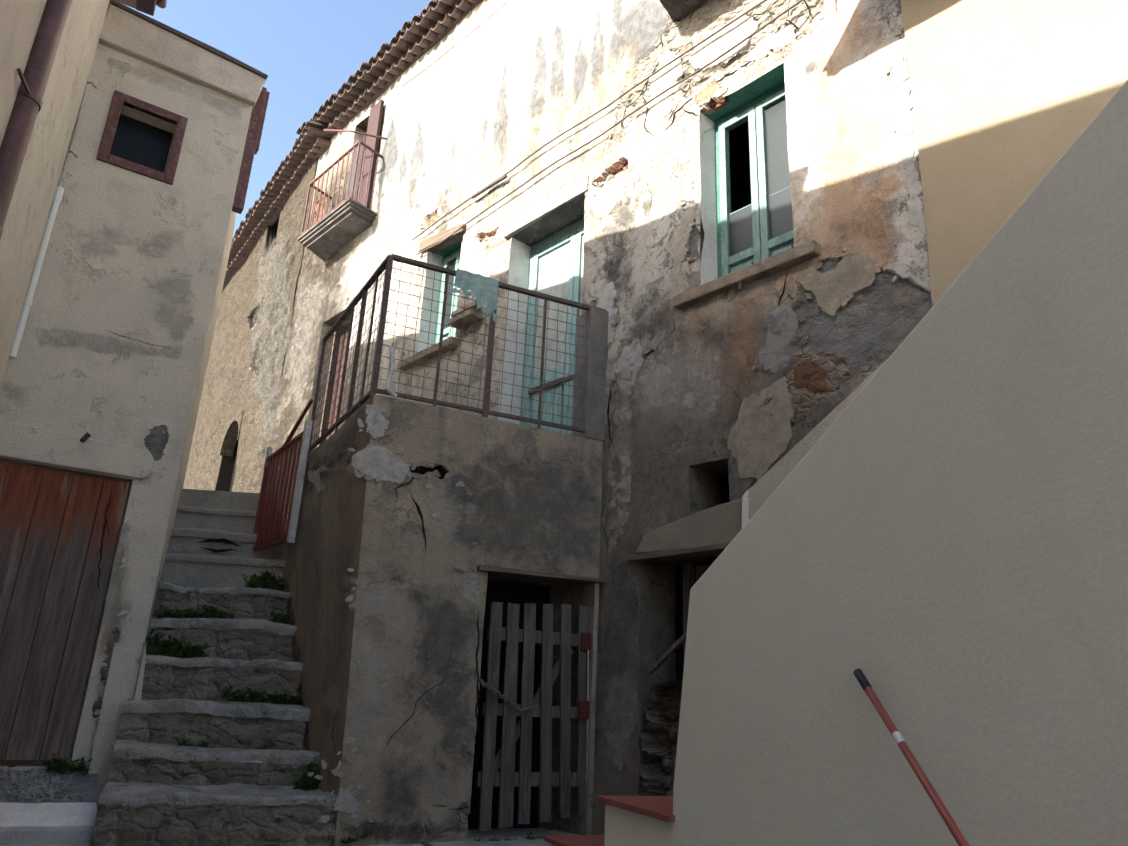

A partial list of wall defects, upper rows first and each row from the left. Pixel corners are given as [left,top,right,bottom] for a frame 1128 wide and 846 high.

leakage [378,119,426,215]
leakage [481,0,669,204]
flaking render [587,0,835,196]
flaking render [884,11,924,227]
flaking render [591,276,647,388]
flaking render [726,246,933,481]
flaking render [132,416,177,473]
flaking render [317,404,493,618]
crack [395,468,426,548]
crack [379,612,480,756]
flaking render [413,792,471,844]